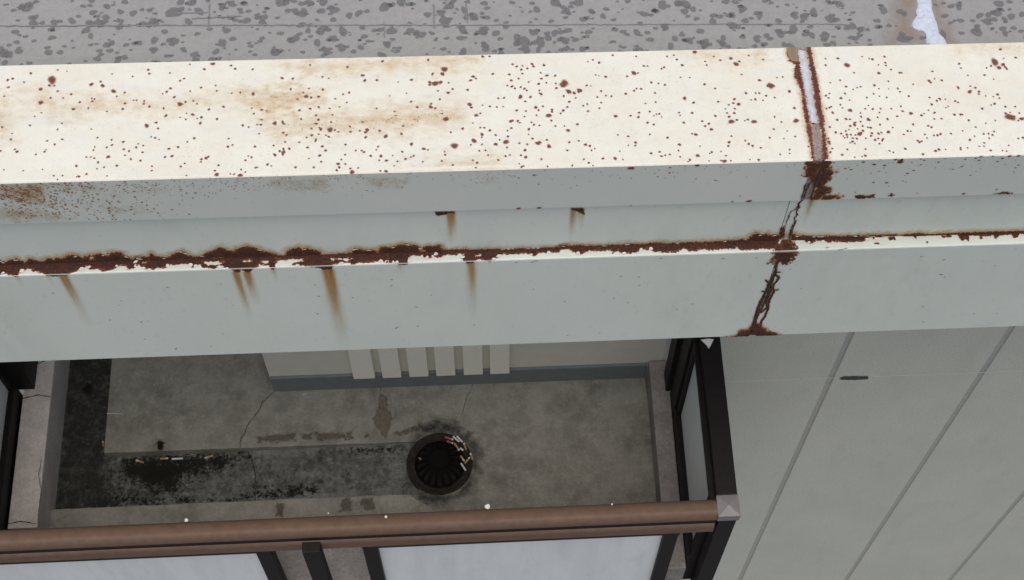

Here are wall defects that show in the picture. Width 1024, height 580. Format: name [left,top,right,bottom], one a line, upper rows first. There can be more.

corrosion [0,59,637,222]
corrosion [650,47,1024,203]
corrosion [435,211,455,224]
corrosion [0,226,1024,302]
crack [751,160,824,332]
crack [240,393,272,501]
leakage [341,498,375,510]